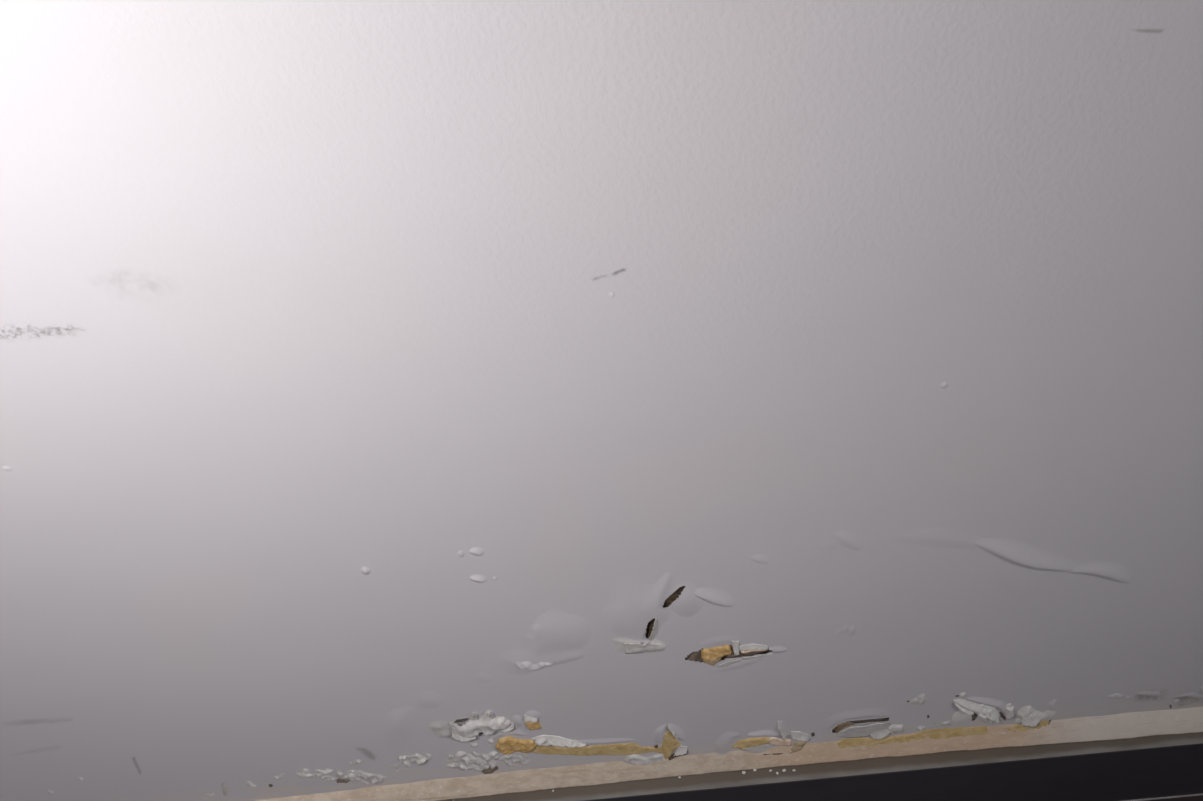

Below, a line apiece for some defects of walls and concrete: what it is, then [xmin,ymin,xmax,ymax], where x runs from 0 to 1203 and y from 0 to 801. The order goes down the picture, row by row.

flaking render [685,635,787,672]
flaking render [242,692,1203,801]